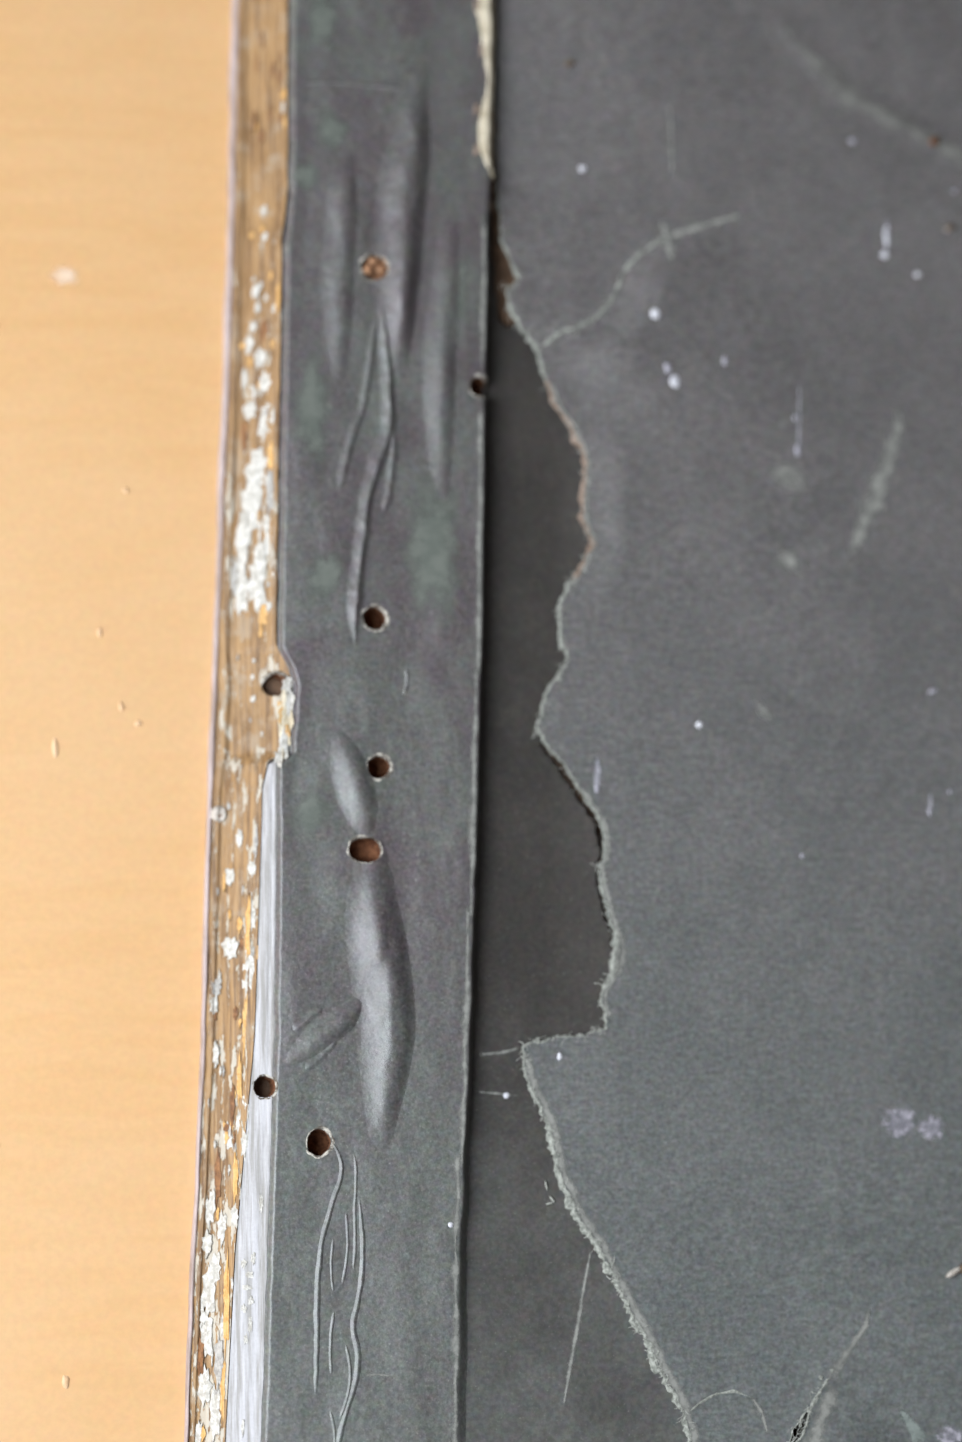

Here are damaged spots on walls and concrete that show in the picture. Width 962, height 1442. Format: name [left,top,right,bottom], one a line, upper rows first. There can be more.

peeling [248,205,268,241]
peeling [230,271,280,638]
peeling [236,654,295,768]
peeling [195,828,259,1442]
leakage [882,1108,943,1140]
crack [691,1313,869,1442]
leakage [937,1427,961,1442]